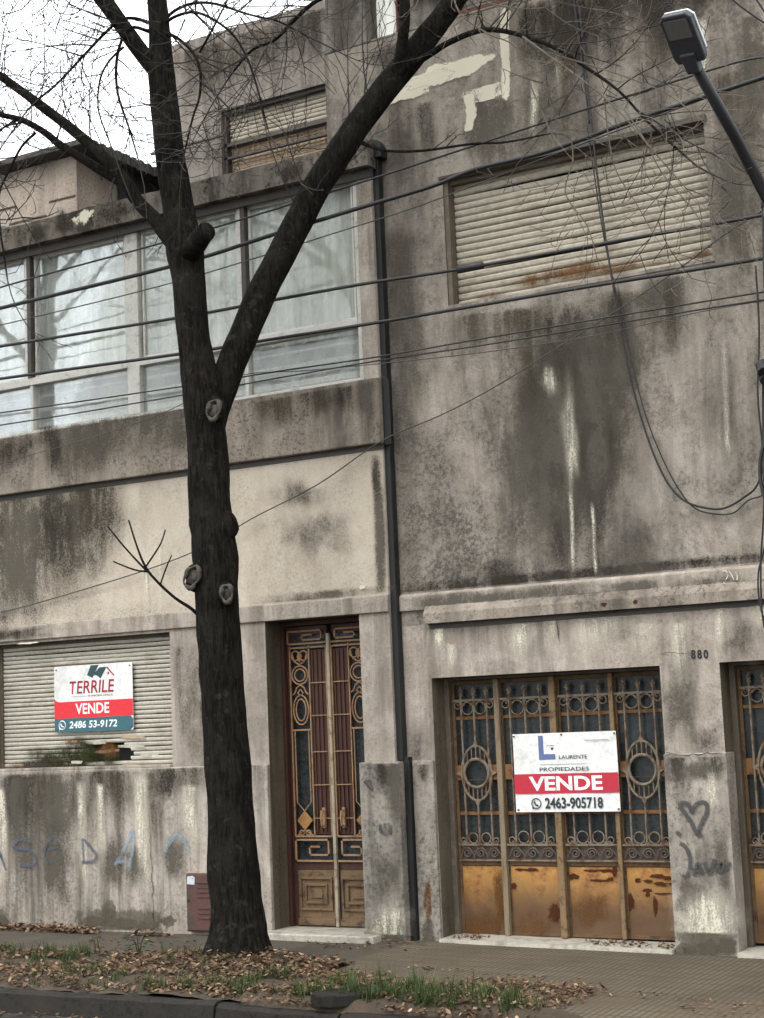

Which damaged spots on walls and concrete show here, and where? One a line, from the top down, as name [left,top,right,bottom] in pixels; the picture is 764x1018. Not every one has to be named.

rust [523,262,637,286]
water stain [403,276,760,607]
water stain [0,409,187,639]
water stain [276,590,355,602]
water stain [0,768,200,894]
rust [468,874,517,935]
rust [519,903,560,937]
rust [569,867,617,882]
rust [628,874,672,917]